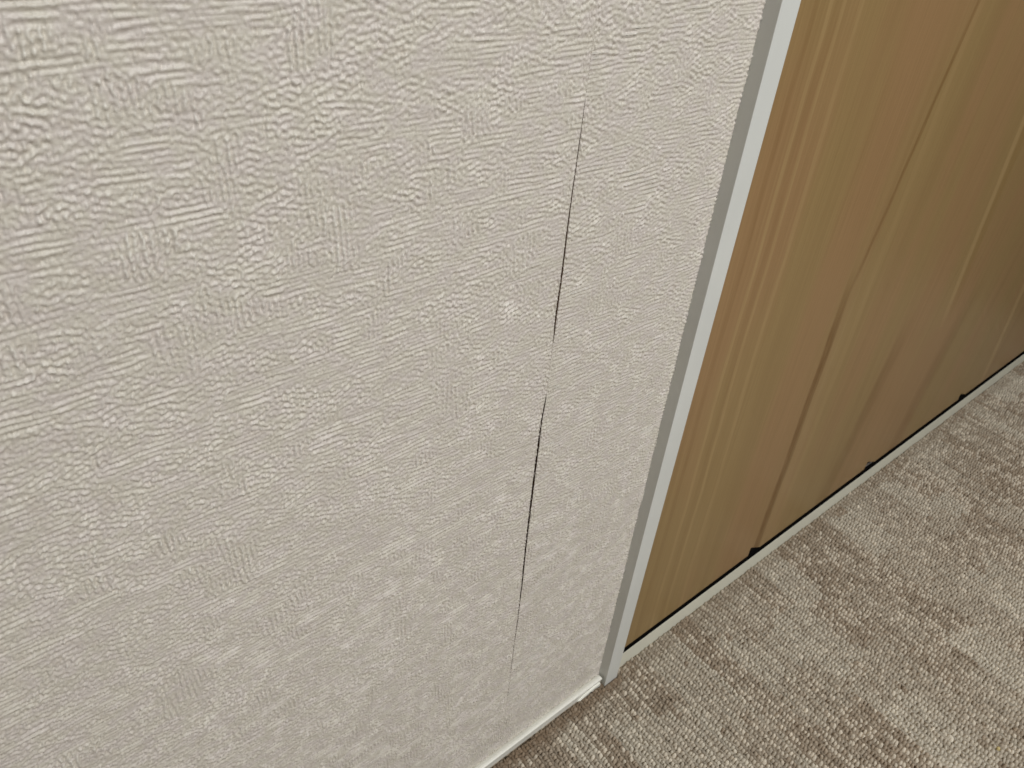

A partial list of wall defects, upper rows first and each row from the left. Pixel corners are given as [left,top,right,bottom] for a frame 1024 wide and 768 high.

crack [507,21,596,696]